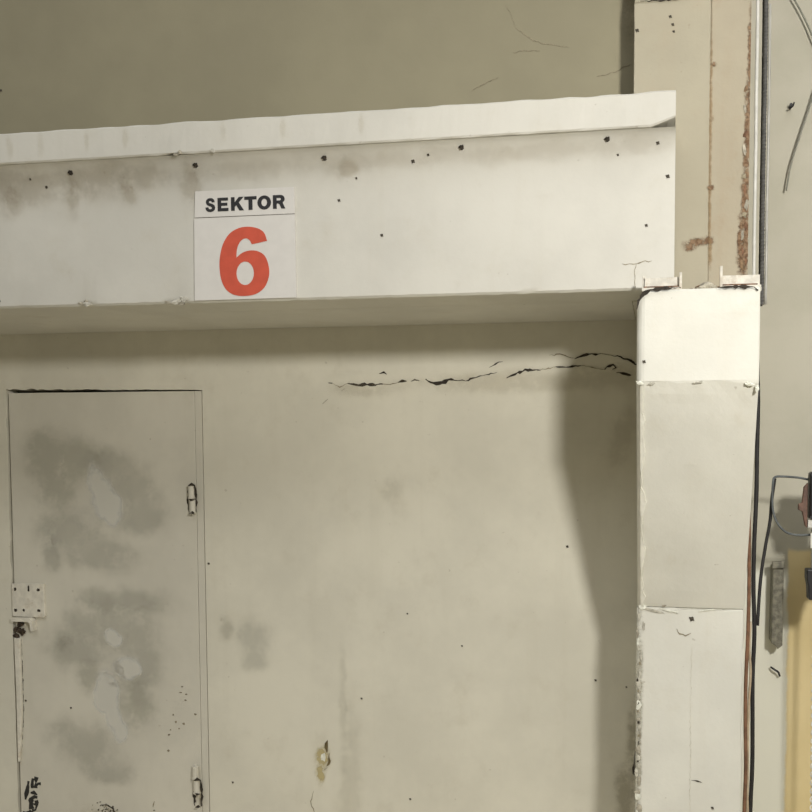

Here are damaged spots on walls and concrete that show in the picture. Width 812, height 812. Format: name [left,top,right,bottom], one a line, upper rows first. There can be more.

rust [737,8,751,275]
crack [322,353,636,404]
peeling [317,740,331,780]
peeling [625,604,677,812]